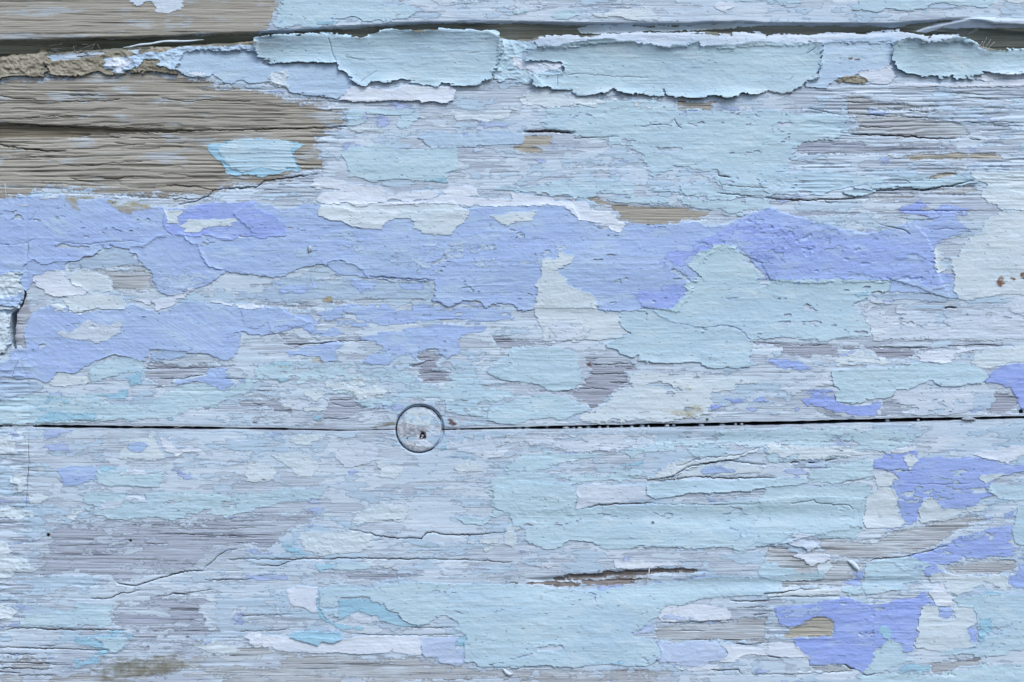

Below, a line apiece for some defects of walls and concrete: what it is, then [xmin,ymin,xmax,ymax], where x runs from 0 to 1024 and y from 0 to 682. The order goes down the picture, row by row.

crack [166,90,247,102]
crack [0,94,344,204]
peeling [0,0,1024,426]
crack [91,527,510,599]
peeling [244,425,1024,682]
peeling [188,640,241,653]
crack [353,627,460,636]